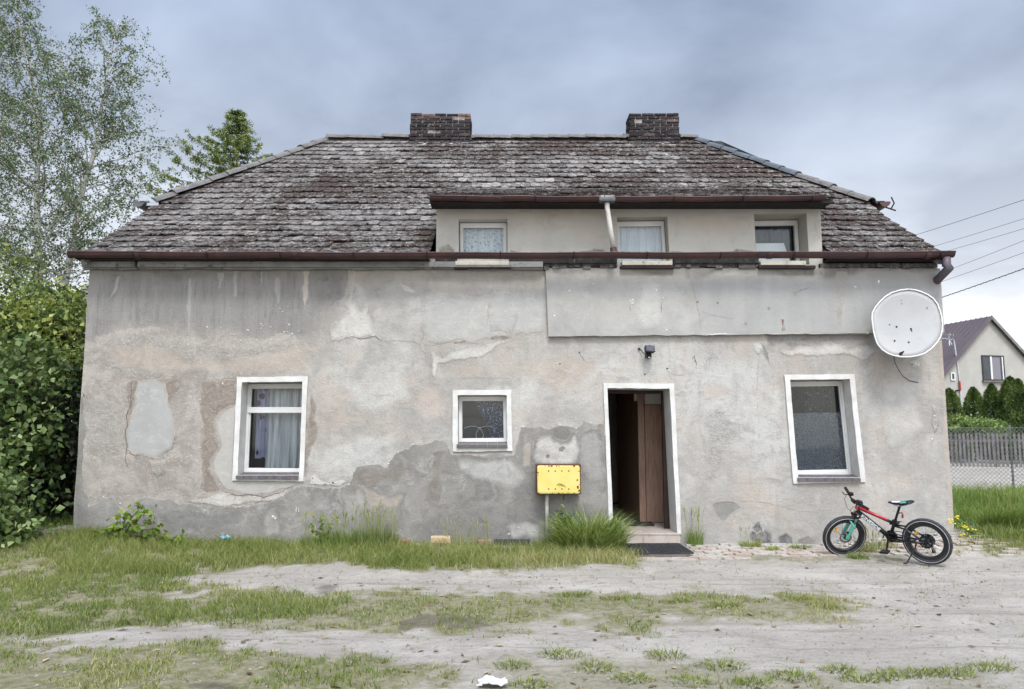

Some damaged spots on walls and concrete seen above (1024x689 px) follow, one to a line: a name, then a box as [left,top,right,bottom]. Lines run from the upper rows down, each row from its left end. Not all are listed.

flaking render [329,271,382,343]
spalling [83,323,301,464]
flaking render [430,341,507,380]
flaking render [187,377,292,519]
flaking render [531,433,582,465]
peeling [506,520,540,539]